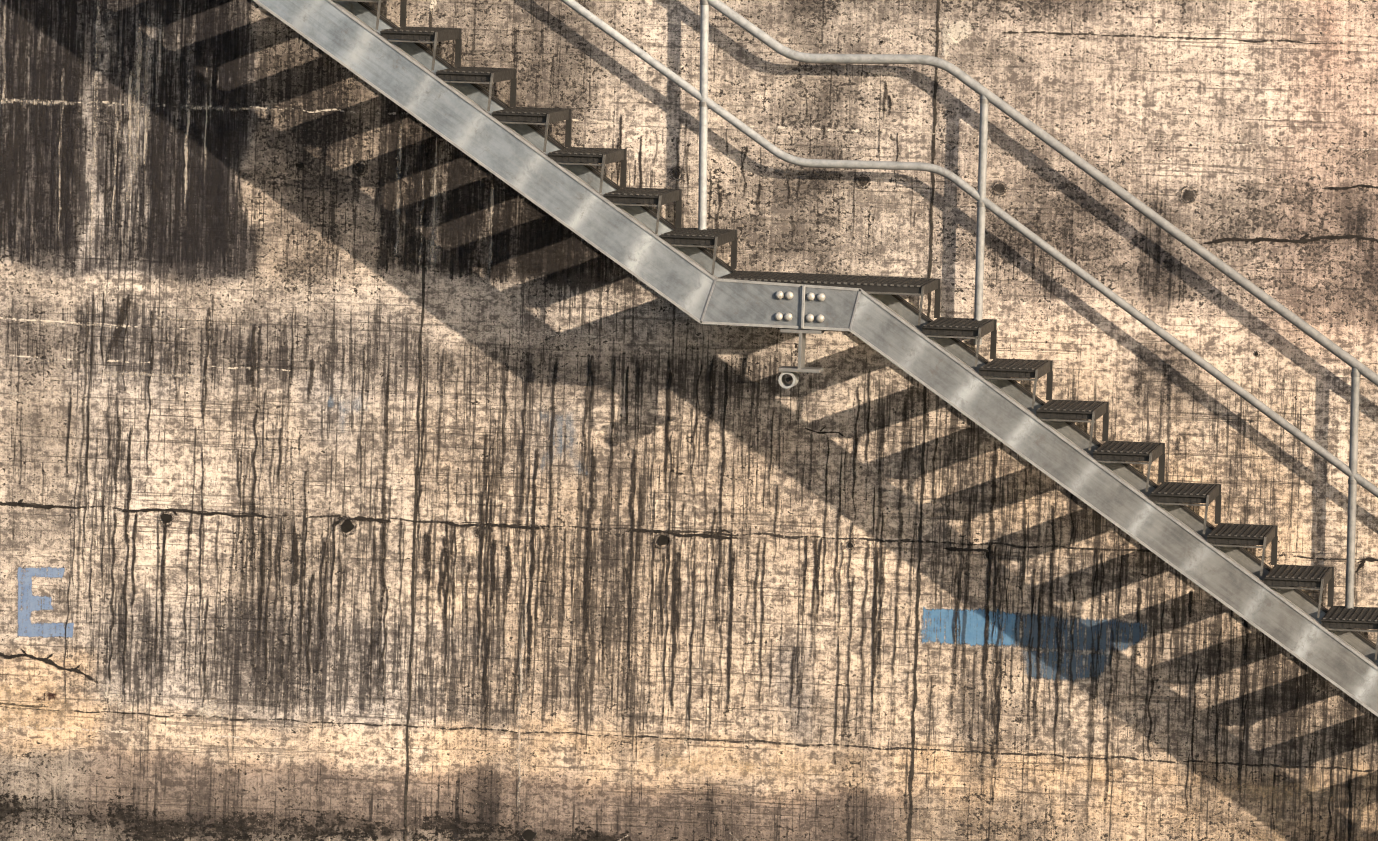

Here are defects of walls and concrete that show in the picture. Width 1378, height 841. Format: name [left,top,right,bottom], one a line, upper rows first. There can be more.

leakage [0,0,265,273]
crack [1323,183,1378,191]
crack [1199,234,1378,245]
leakage [1137,347,1189,403]
leakage [1,291,778,774]
leakage [790,369,915,764]
crack [0,649,99,684]
leakage [932,438,1371,841]
crack [0,701,52,709]
leakage [0,794,417,840]